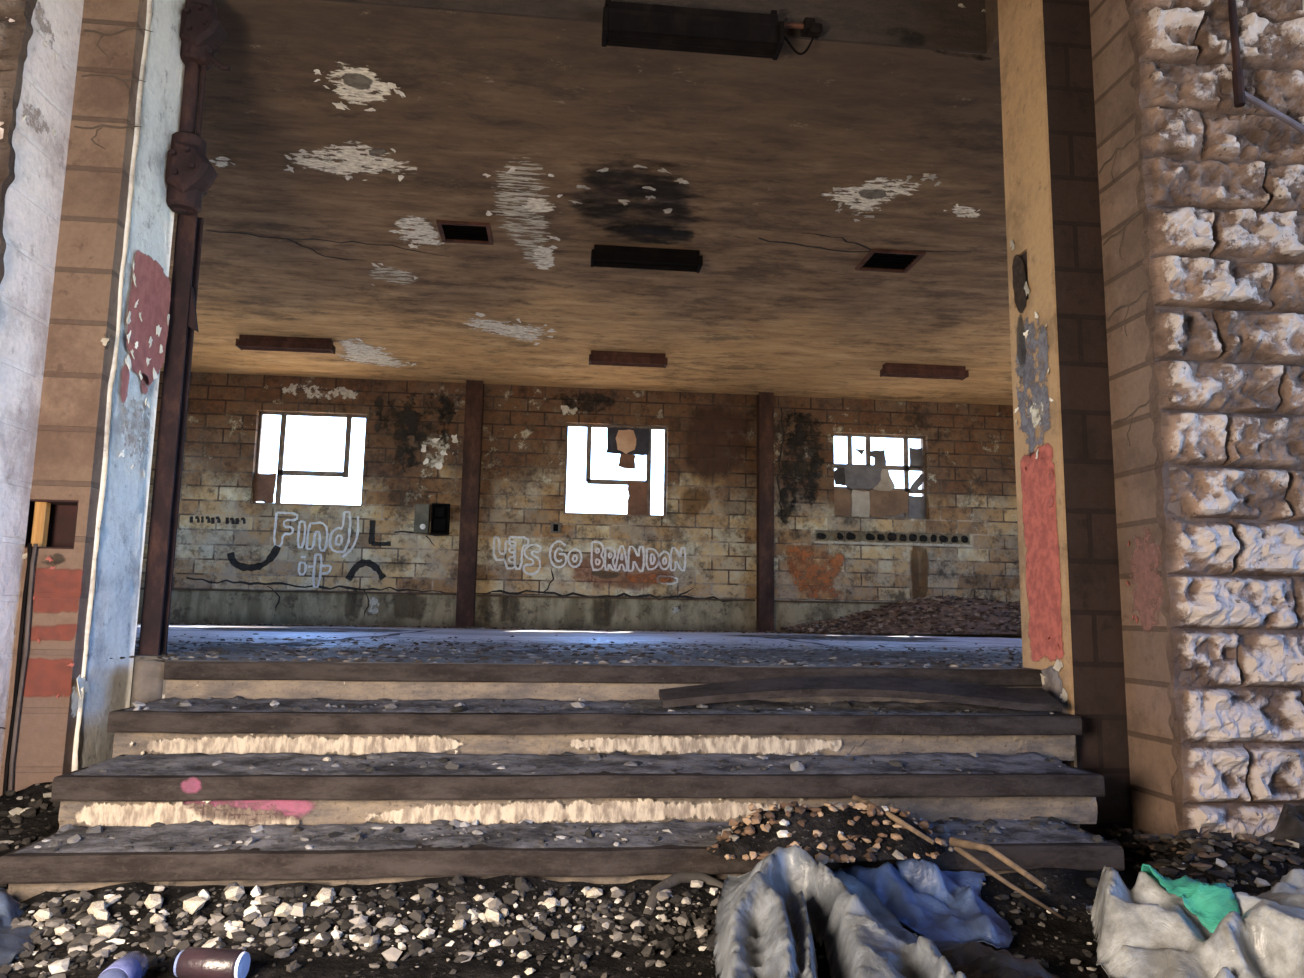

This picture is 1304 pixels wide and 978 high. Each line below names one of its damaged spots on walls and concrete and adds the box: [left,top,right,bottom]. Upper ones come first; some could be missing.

peeling [314,62,405,111]
peeling [284,141,416,181]
peeling [390,216,444,248]
peeling [483,157,591,270]
water stain [607,225,693,244]
peeling [821,173,941,222]
peeling [463,312,556,346]
water stain [779,413,825,524]